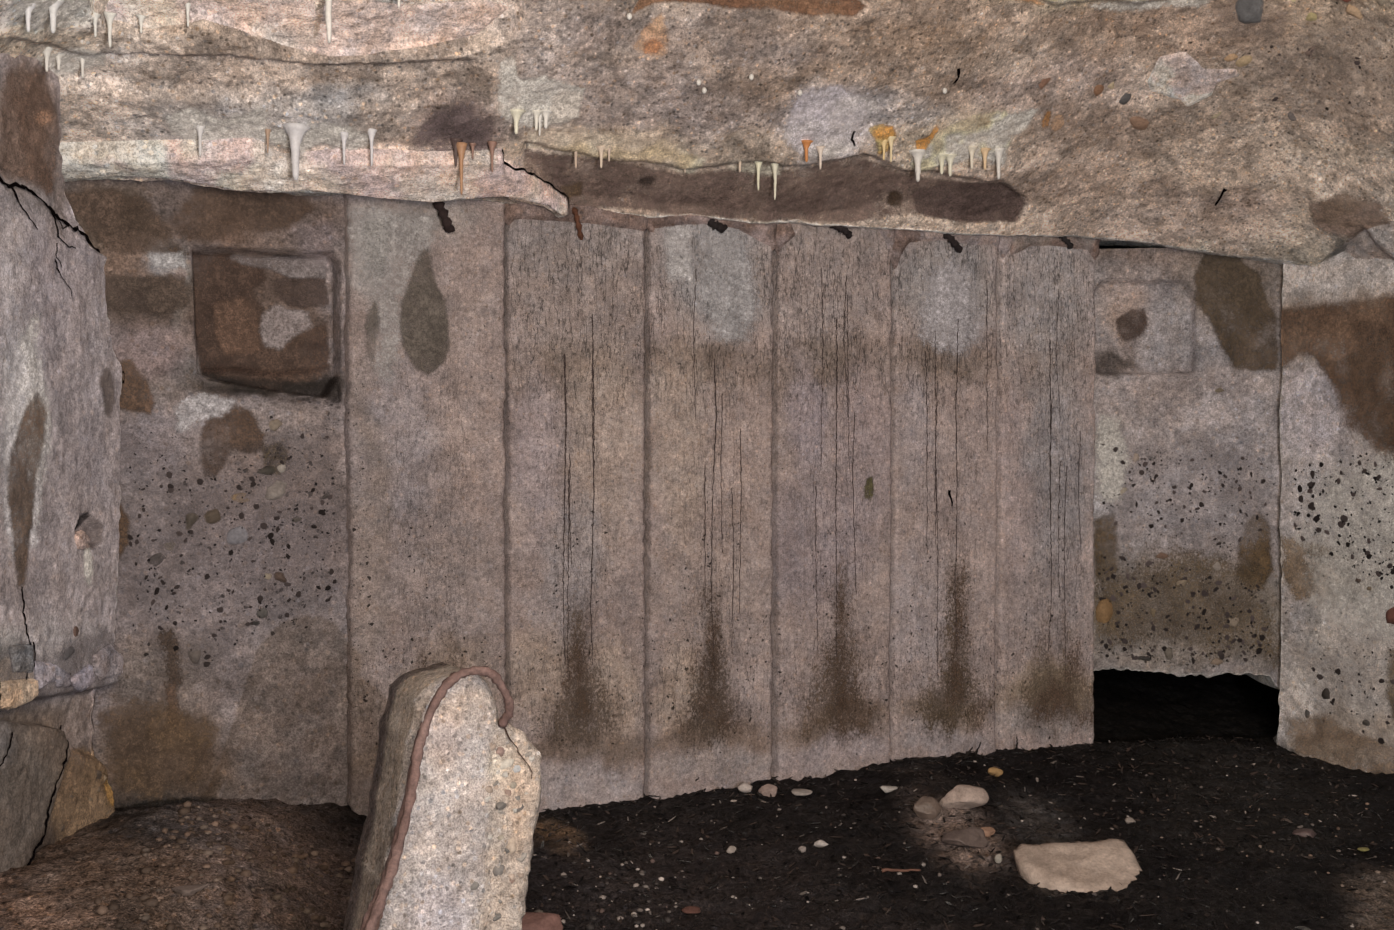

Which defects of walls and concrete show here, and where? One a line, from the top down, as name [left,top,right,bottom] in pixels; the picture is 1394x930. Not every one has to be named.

crack [0,167,100,294]
damp [1,0,377,391]
damp [348,210,449,376]
damp [417,106,491,152]
crack [502,149,569,202]
damp [498,57,1037,339]
damp [2,324,51,586]
damp [101,359,154,417]
damp [176,393,288,477]
damp [1195,254,1394,629]
damp [680,590,745,748]
damp [918,559,994,738]